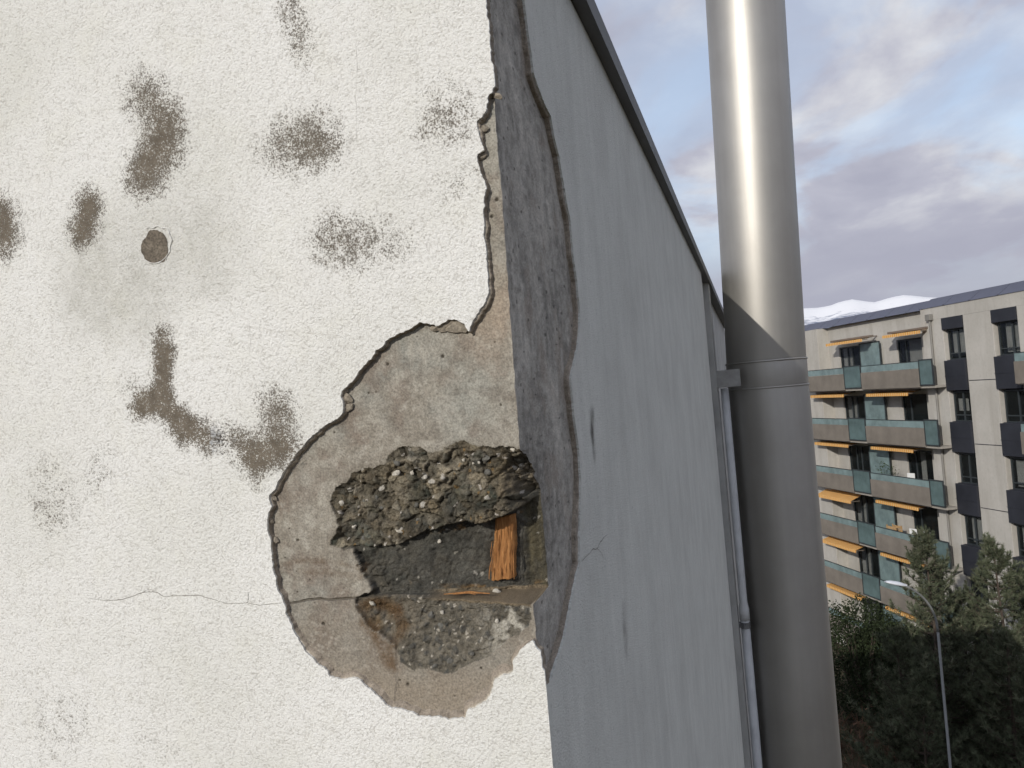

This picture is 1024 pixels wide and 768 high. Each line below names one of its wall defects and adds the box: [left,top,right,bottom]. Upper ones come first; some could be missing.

water stain [121,66,190,206]
water stain [255,104,347,177]
mould [418,85,478,145]
water stain [0,191,26,264]
water stain [66,182,107,254]
flaking render [141,226,172,264]
water stain [308,213,412,272]
spalling [269,0,579,719]
water stain [124,323,304,490]